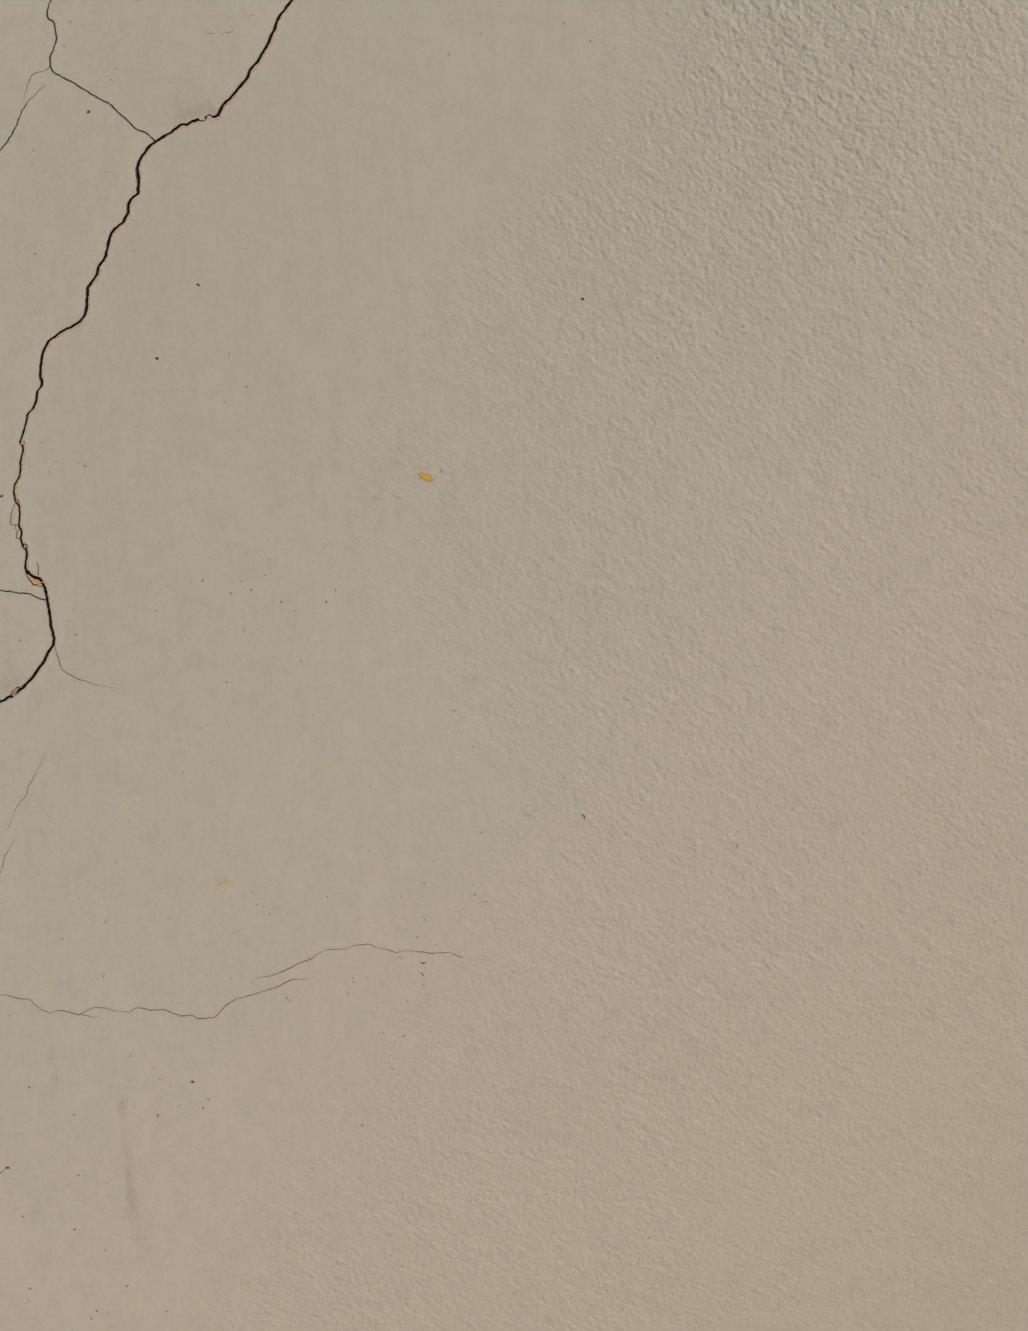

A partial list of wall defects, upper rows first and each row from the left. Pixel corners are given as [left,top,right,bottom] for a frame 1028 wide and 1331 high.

crack [0,0,294,703]
crack [0,754,45,873]
crack [6,944,460,1019]